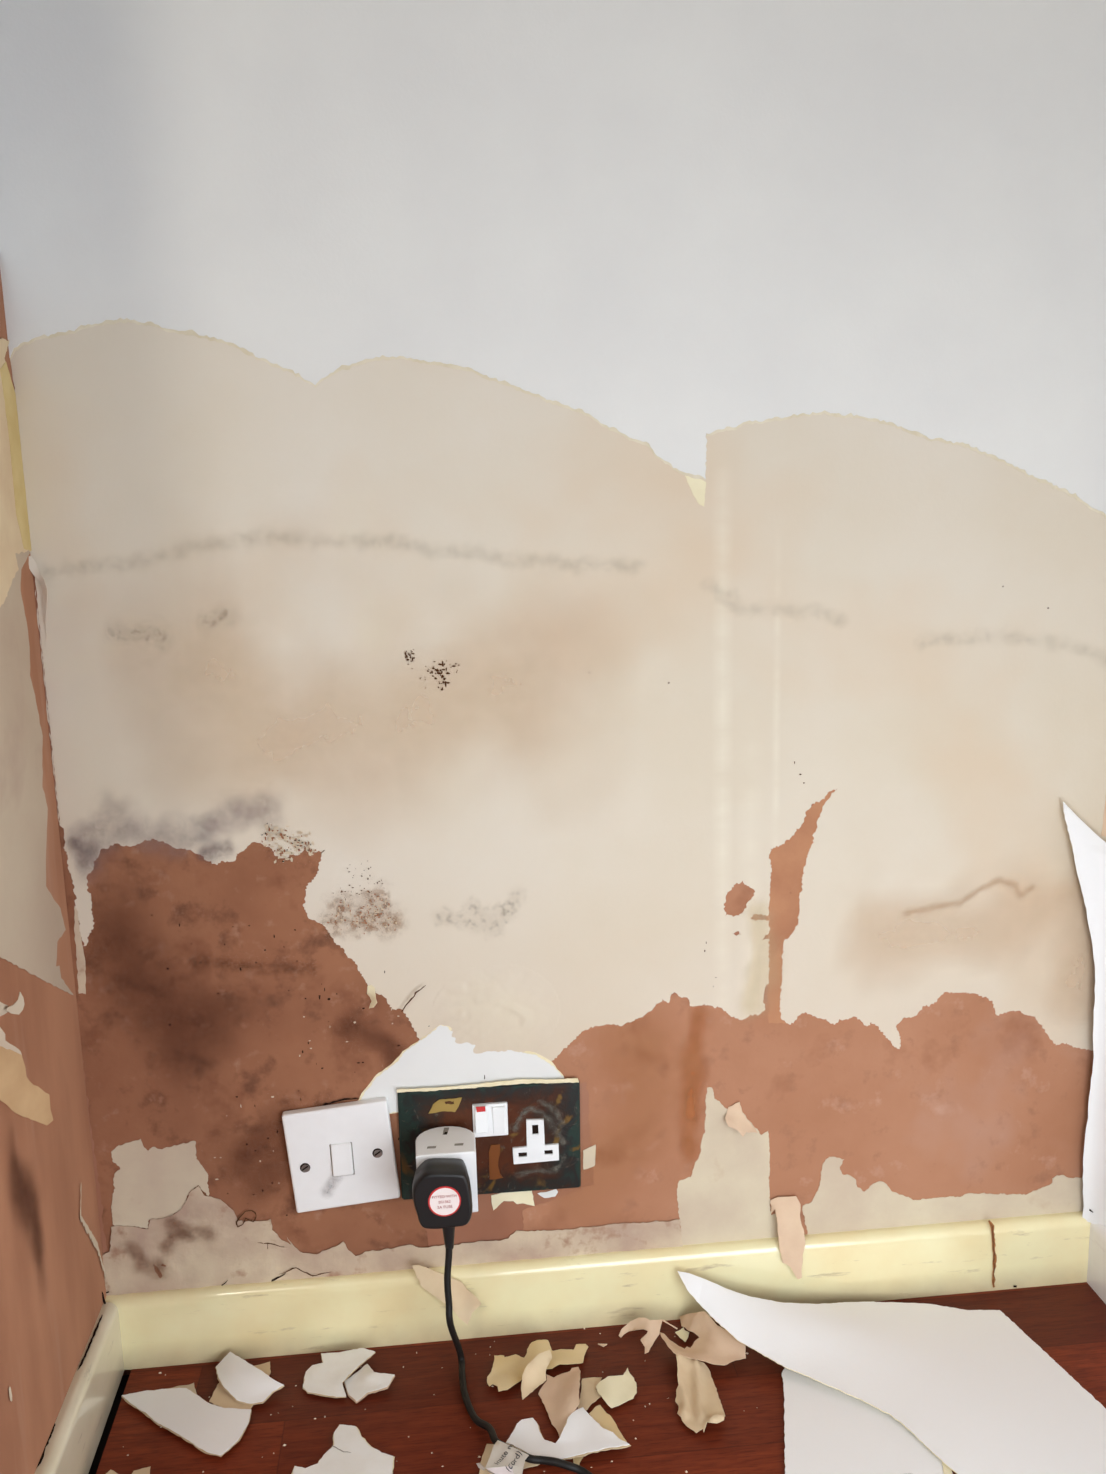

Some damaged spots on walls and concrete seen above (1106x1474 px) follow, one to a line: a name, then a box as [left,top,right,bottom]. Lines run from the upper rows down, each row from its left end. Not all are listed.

water stain [330,895,399,930]
flaking render [29,556,1106,1325]
peeling [0,992,53,1125]
crack [988,1220,997,1288]